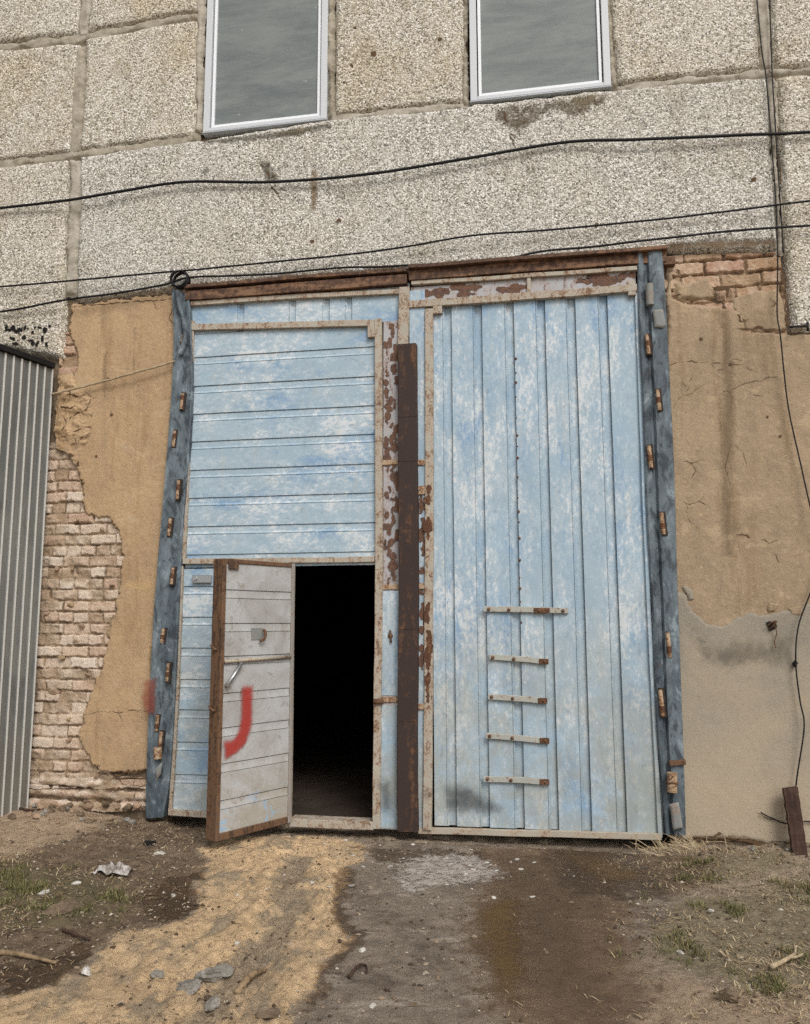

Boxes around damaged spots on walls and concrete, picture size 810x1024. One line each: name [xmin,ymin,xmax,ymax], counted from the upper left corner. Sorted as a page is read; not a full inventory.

water stain [497,95,604,128]
flaking render [664,252,789,335]
flaking render [59,332,79,375]
crack [671,359,779,408]
rust [423,485,433,540]
flaking render [28,442,147,812]
rust [424,602,433,703]
peeling [672,586,810,847]